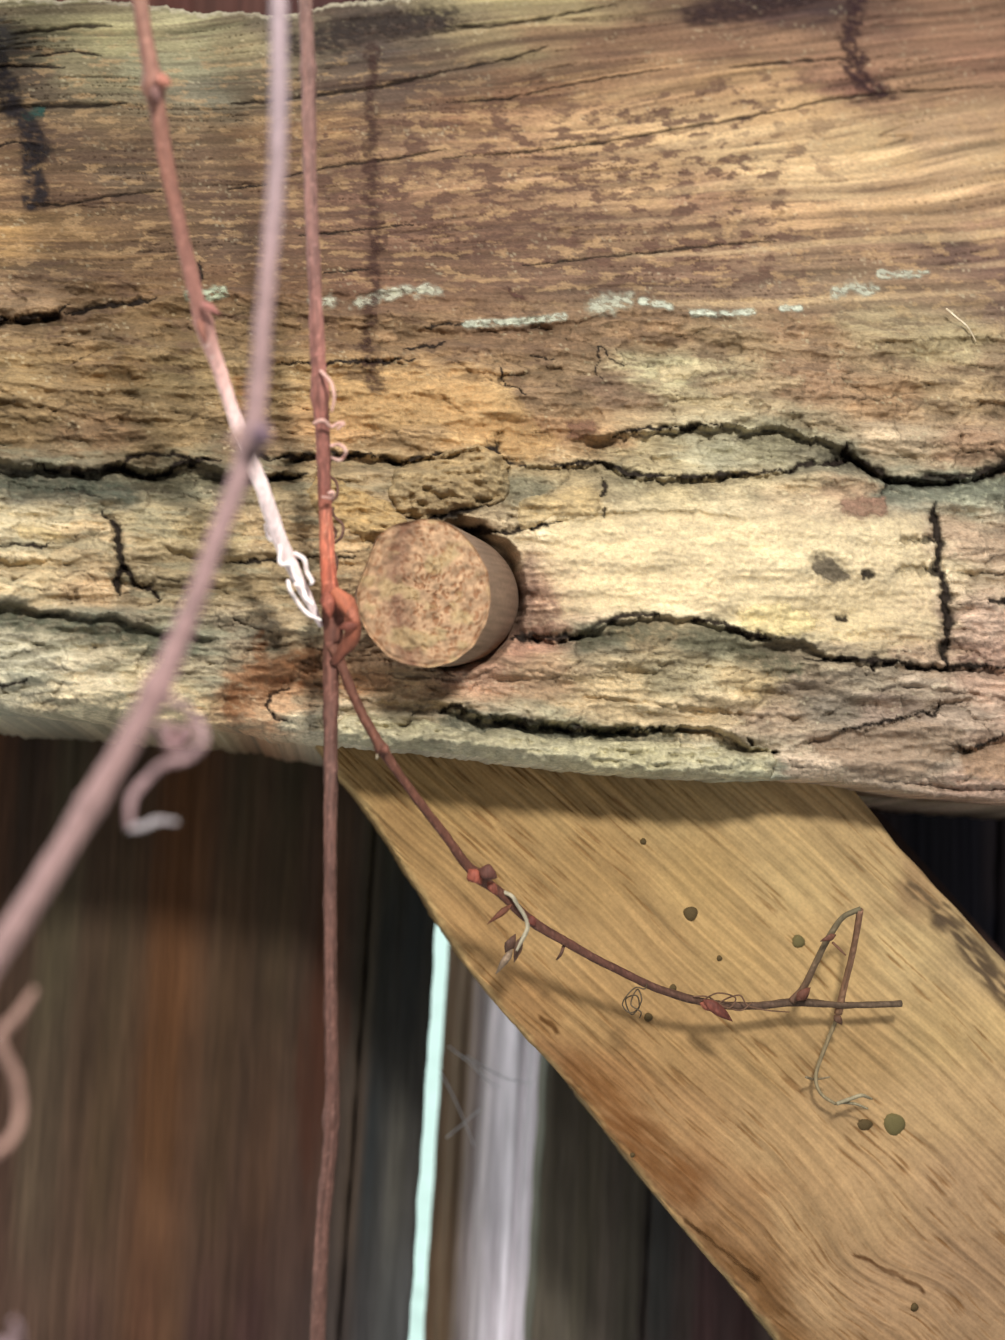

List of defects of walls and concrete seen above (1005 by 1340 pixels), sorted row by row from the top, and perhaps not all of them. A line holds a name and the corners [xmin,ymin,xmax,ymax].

leakage [841,0,892,99]
leakage [0,19,50,210]
crack [0,298,156,326]
crack [37,450,442,600]
crack [485,422,1005,731]
crack [436,704,665,735]
crack [953,732,1003,754]